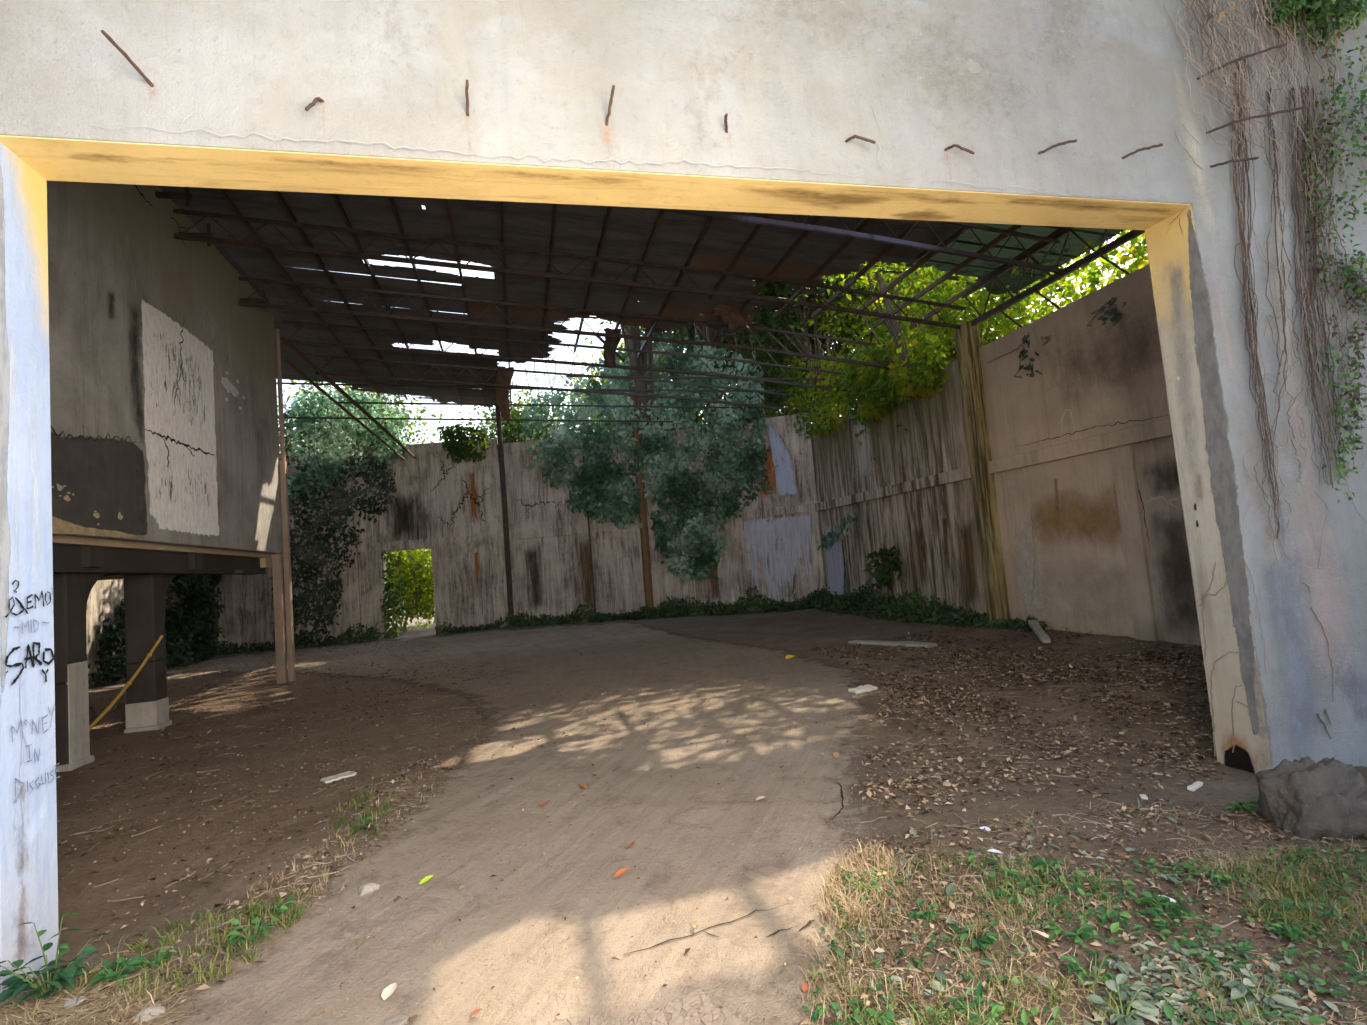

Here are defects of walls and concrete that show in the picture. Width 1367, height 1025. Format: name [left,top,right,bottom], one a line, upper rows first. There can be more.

leakage [768,190,885,204]
crack [51,317,217,472]
peeling [141,299,245,537]
peeling [52,511,144,539]
leakage [1156,465,1179,487]
leakage [1163,522,1198,624]